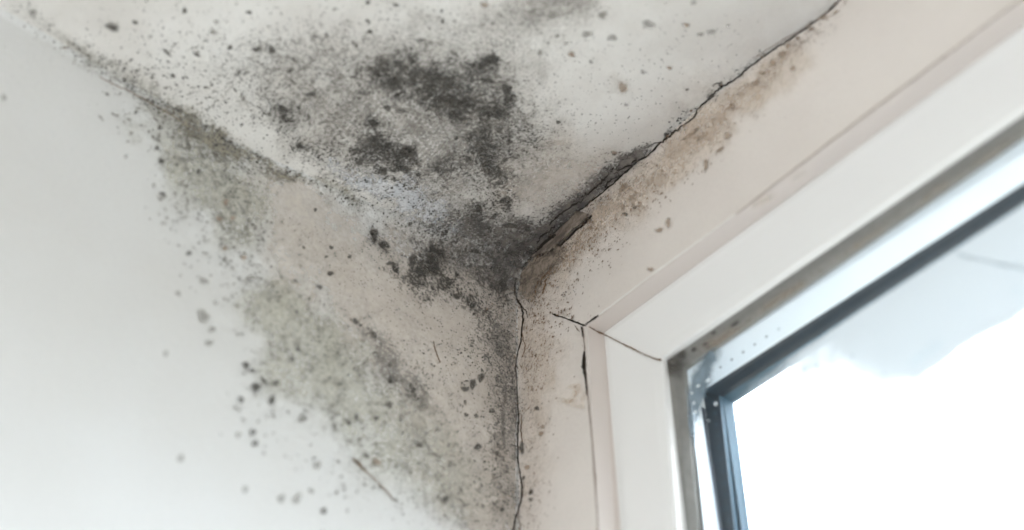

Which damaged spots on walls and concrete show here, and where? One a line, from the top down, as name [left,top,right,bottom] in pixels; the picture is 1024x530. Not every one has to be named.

damp [53,0,846,530]
crack [512,0,1020,530]